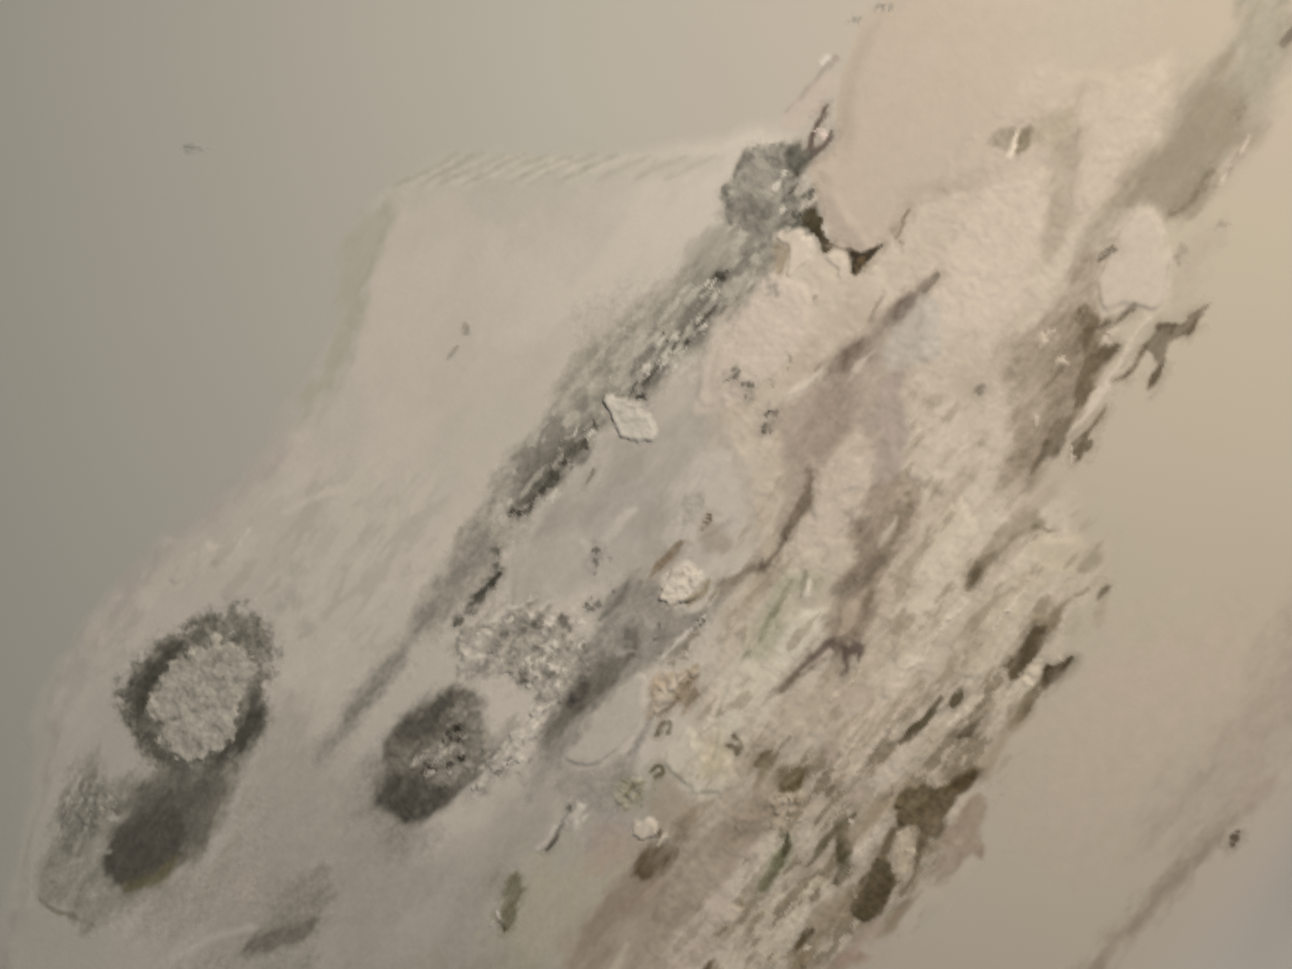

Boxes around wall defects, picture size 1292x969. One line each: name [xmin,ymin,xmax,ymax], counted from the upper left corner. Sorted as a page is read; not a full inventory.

flaking render [430,535,621,804]
damp [306,133,829,772]
flaking render [575,455,608,494]
damp [0,555,1292,969]
peeling [638,655,710,724]
peeling [640,486,742,612]
damp [714,0,1292,721]